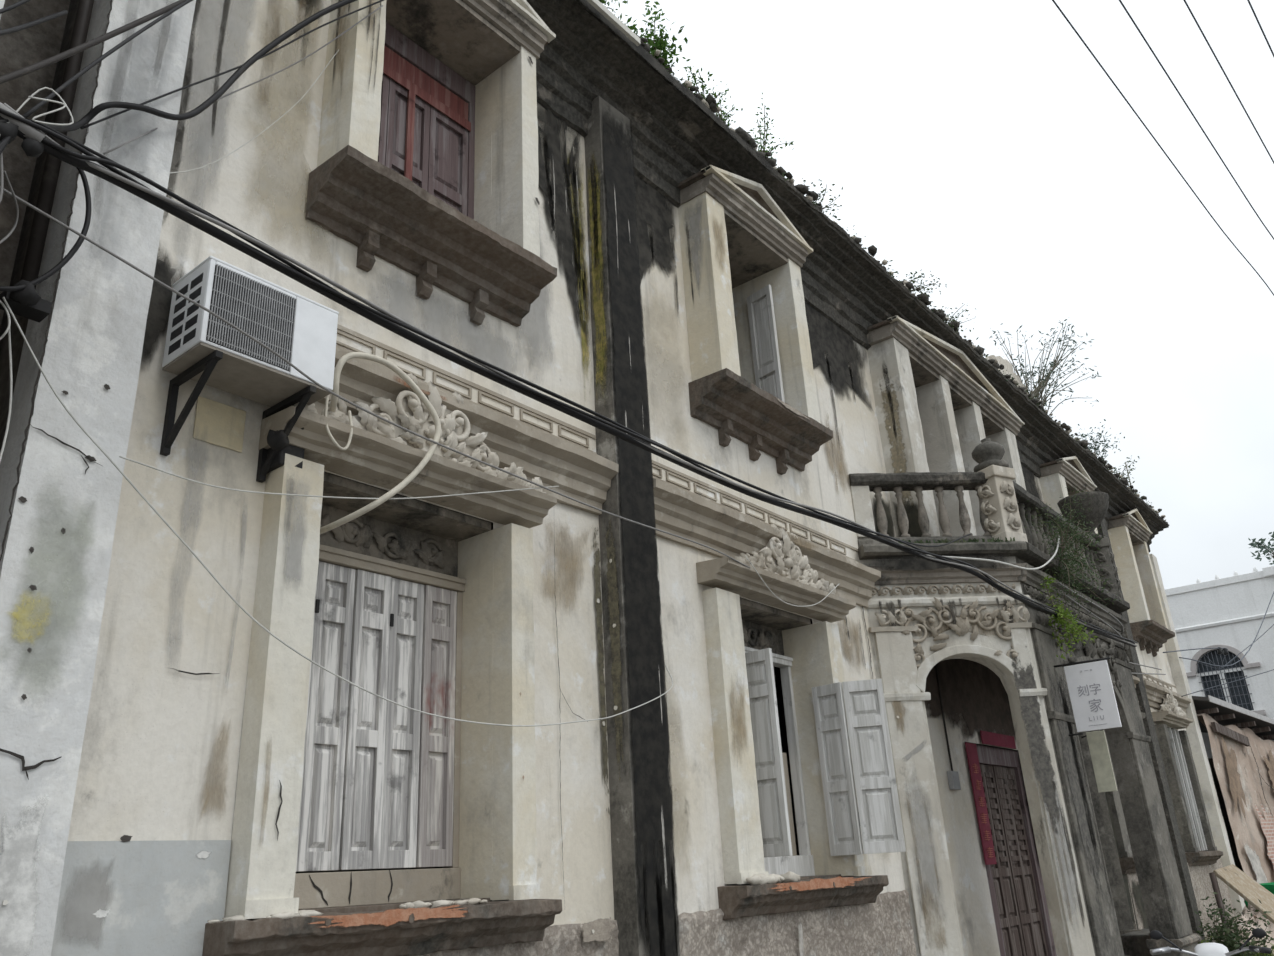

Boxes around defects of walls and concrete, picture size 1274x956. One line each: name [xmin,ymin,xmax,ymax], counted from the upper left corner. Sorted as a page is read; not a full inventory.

crack [0,0,112,561]
damp [805,302,872,486]
damp [537,100,701,956]
crack [170,667,220,675]
crack [0,748,62,780]
crack [275,780,283,841]
peeling [1222,738,1274,884]
crack [309,873,352,905]
spalling [310,905,472,928]
spalling [771,876,871,891]